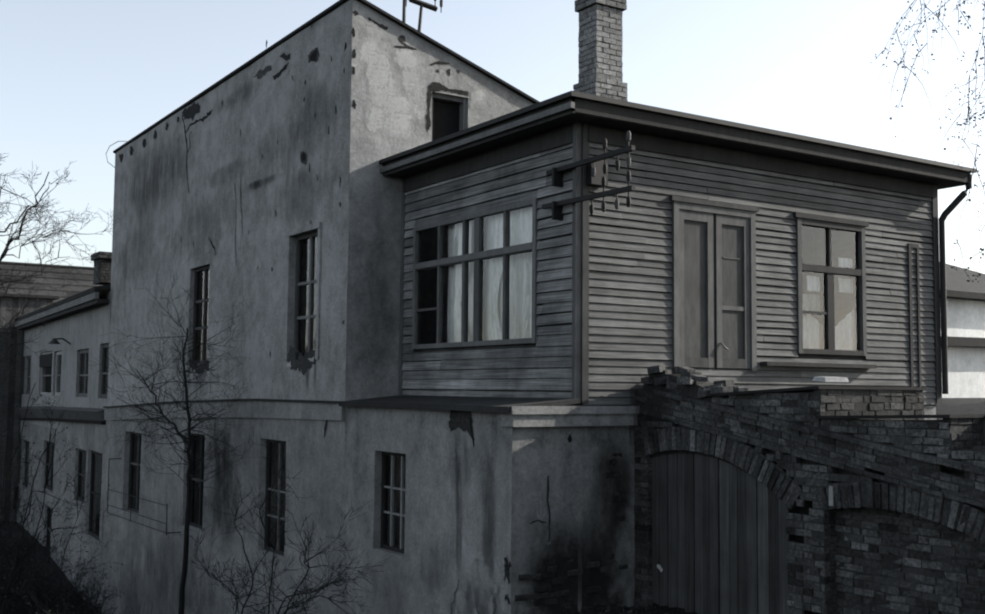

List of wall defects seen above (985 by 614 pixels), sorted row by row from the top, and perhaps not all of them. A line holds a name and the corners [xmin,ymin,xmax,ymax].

flaking render [254,52,293,80]
spalling [308,48,332,63]
flaking render [343,28,485,140]
spalling [119,102,212,163]
crack [182,109,213,192]
spalling [287,345,320,375]
flaking render [449,410,475,446]
crack [530,476,551,548]
spalling [471,543,628,614]